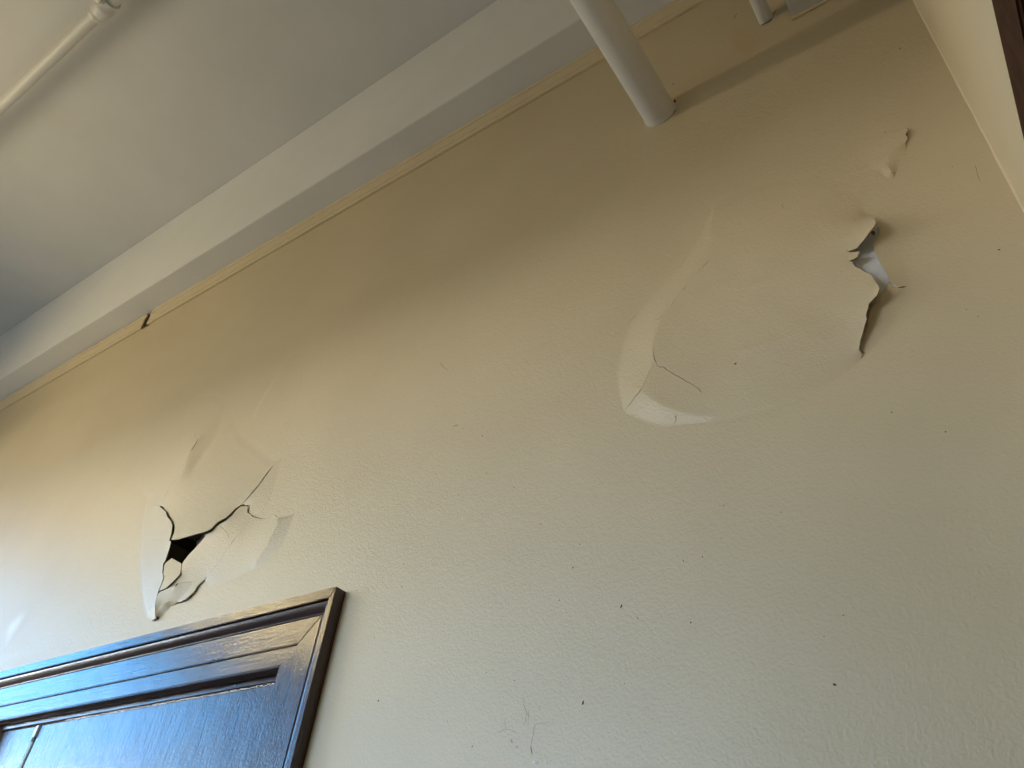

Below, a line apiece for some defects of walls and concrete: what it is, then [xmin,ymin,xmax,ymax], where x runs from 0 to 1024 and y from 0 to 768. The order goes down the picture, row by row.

peeling [159,509,237,591]